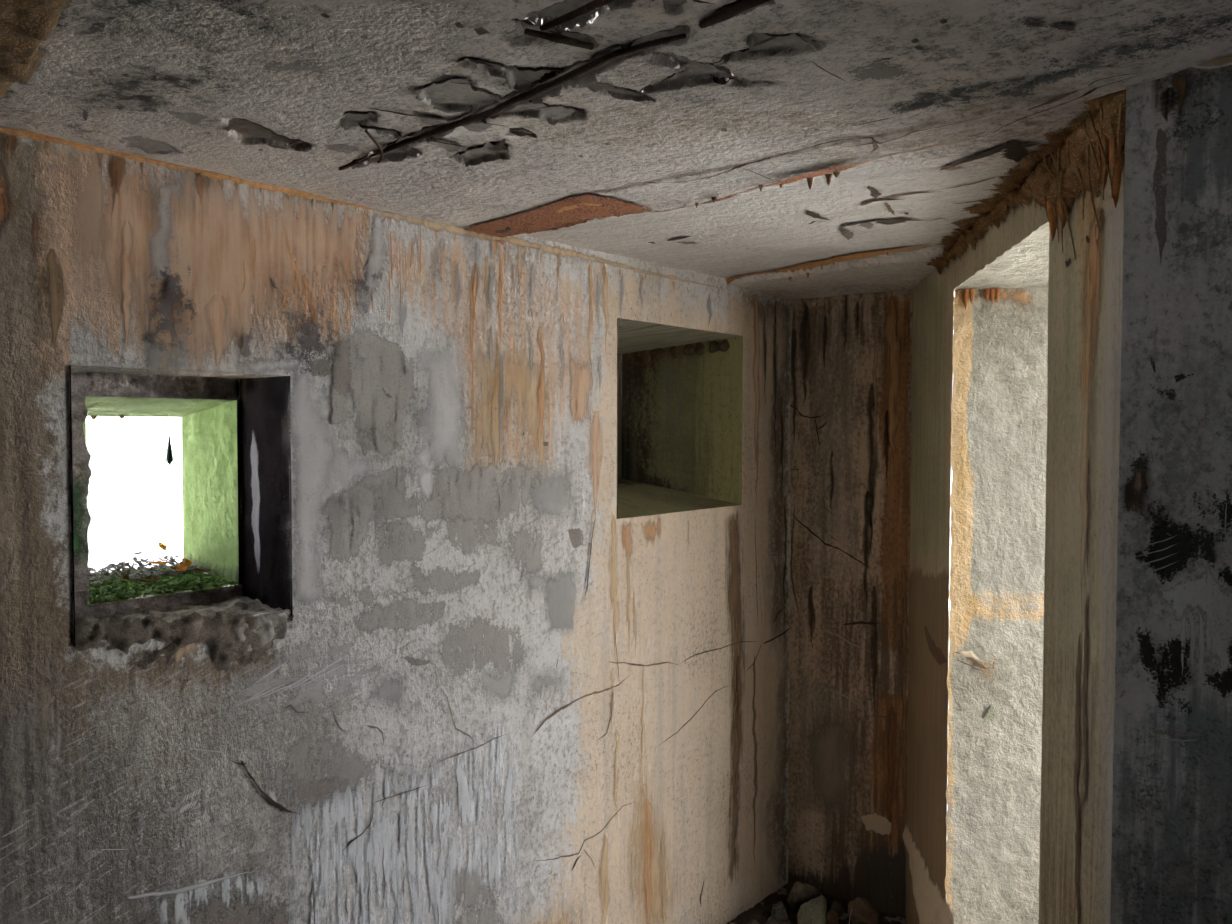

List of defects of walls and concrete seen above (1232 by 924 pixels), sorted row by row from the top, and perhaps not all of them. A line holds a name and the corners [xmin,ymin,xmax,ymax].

rust [0,0,73,103]
spalling [168,0,827,171]
leakage [1153,74,1229,265]
rust [0,90,1126,601]
spalling [70,611,294,671]
crack [342,405,880,851]
rust [611,515,660,649]
leakage [753,294,827,626]
leakage [863,383,889,718]
peeling [1134,490,1232,721]
crack [230,760,302,815]
crack [534,802,635,870]